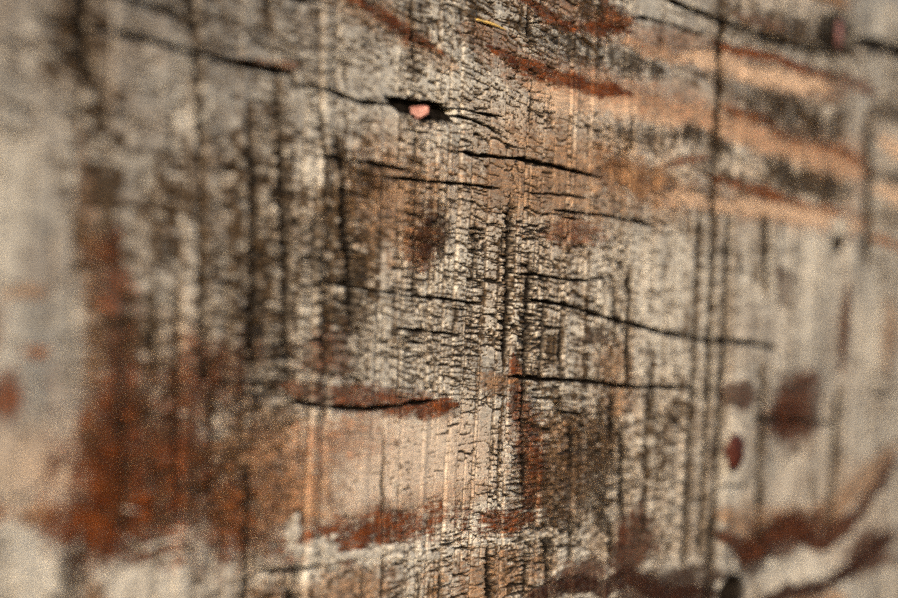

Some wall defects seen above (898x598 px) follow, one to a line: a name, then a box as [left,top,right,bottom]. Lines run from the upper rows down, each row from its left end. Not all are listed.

rust [522,0,877,95]
crack [854,37,898,59]
crack [447,108,653,226]
crack [862,109,873,264]
crack [34,0,499,539]
crack [498,0,841,598]
crack [238,461,321,598]
crack [415,569,441,595]
crack [483,549,494,598]